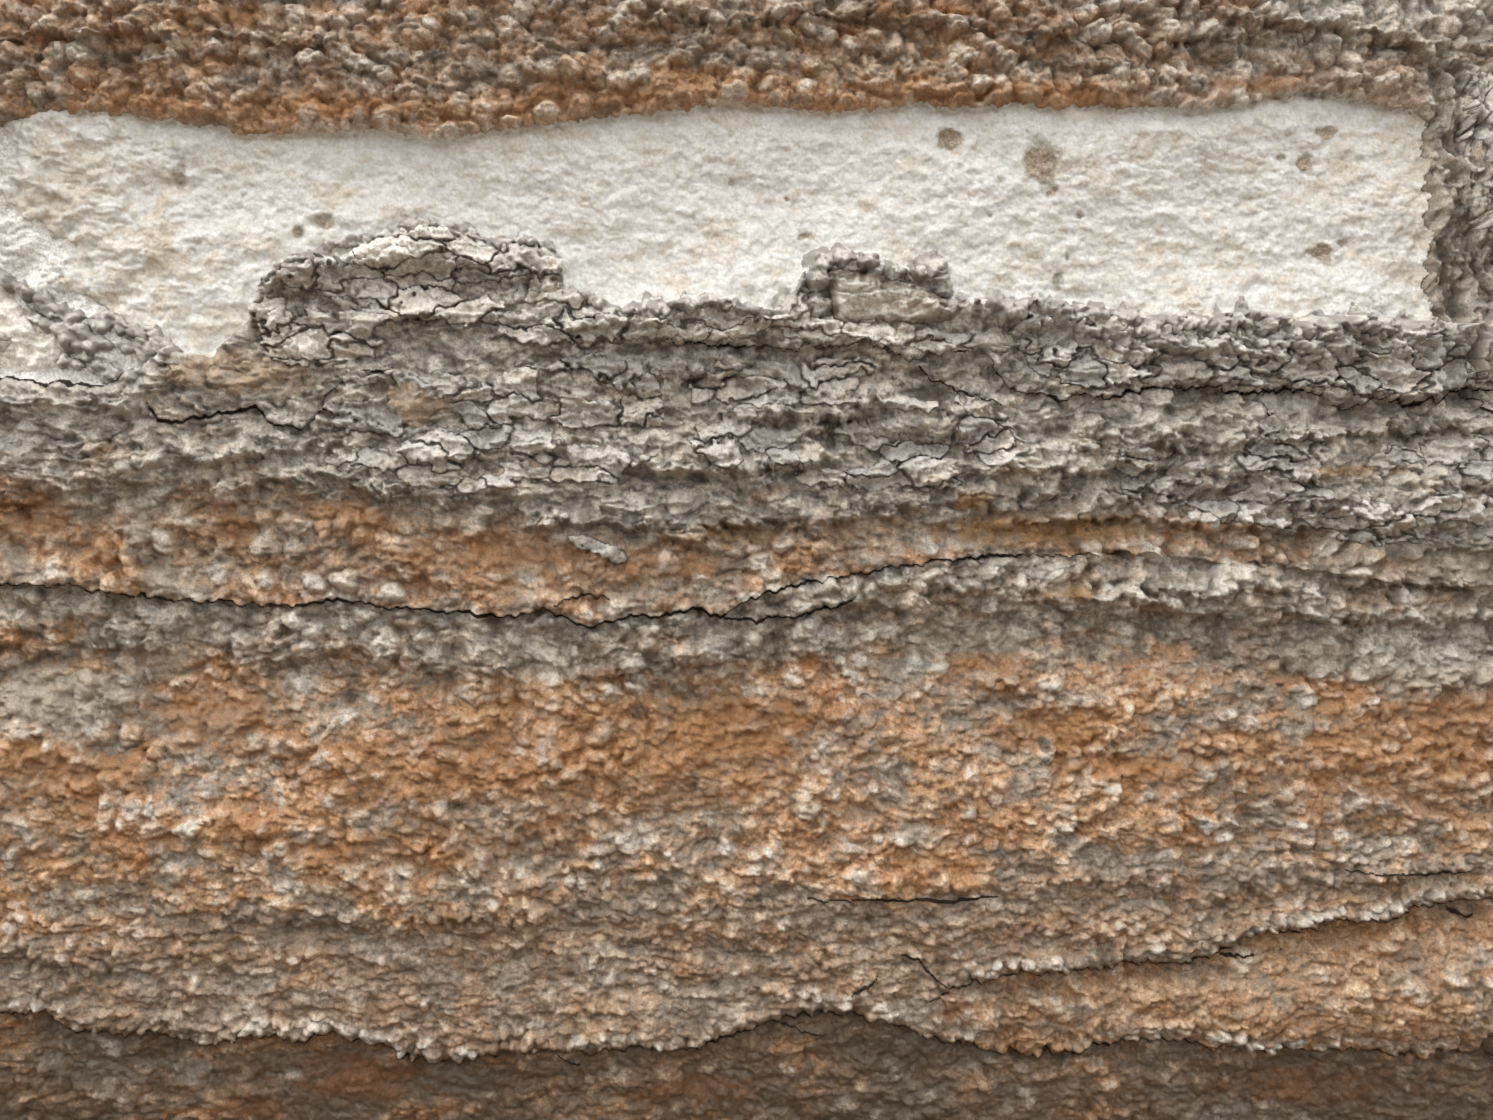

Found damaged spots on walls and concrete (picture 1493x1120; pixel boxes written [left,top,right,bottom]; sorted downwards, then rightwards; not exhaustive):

spalling [0,71,1493,502]
crack [0,552,1090,629]
crack [0,869,1493,1066]